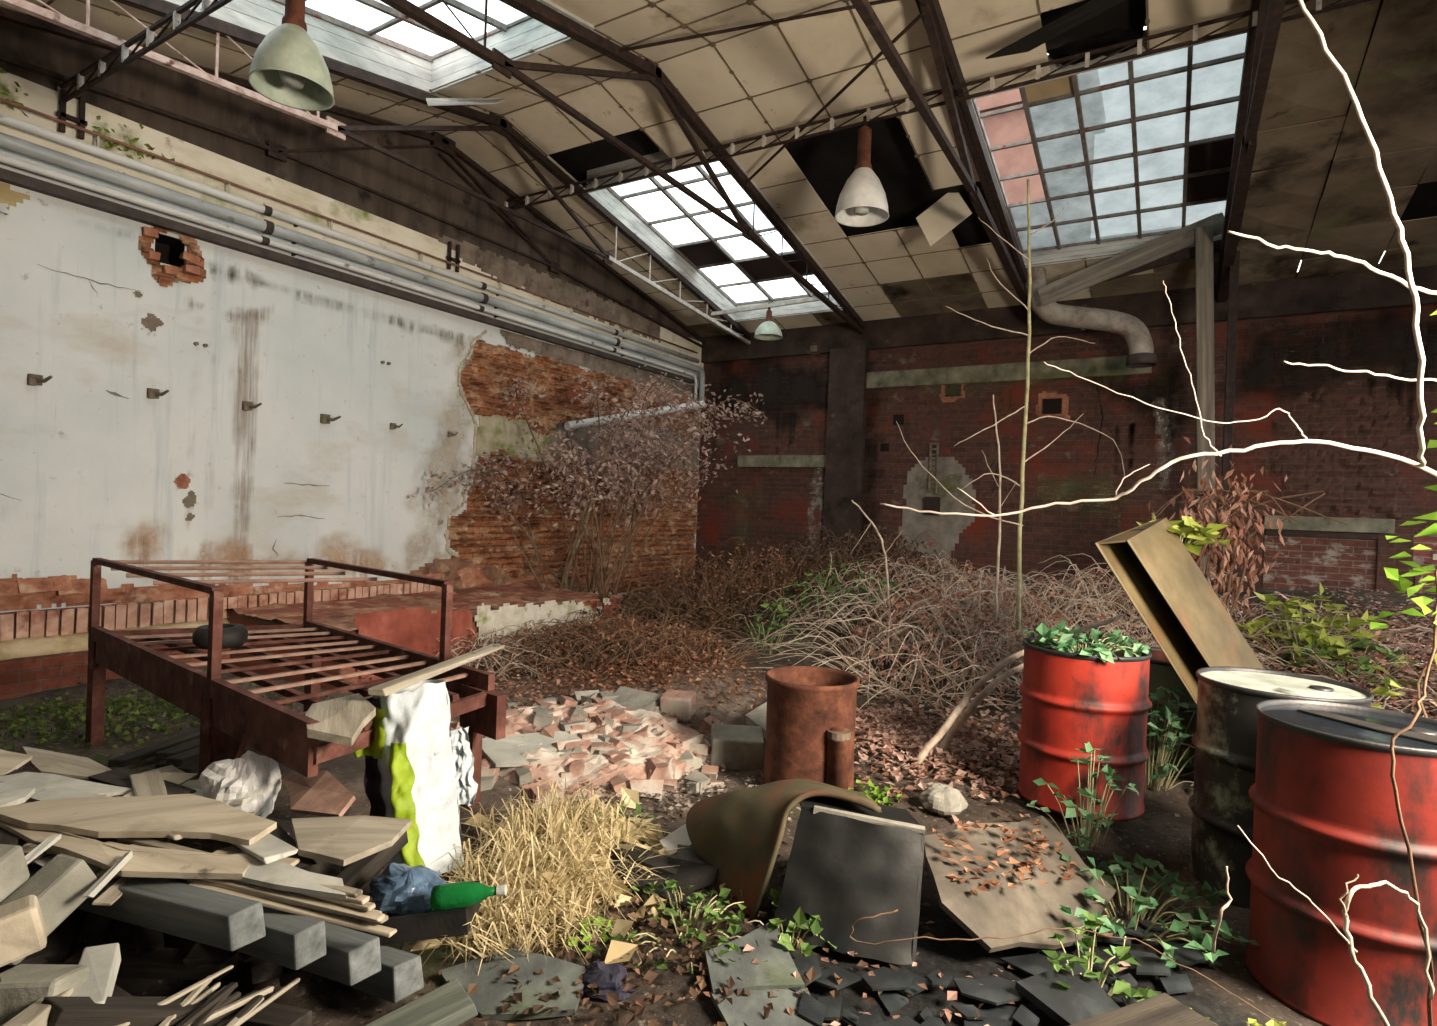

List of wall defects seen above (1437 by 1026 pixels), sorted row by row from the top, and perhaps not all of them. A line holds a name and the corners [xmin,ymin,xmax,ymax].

peeling [0,182,30,216]
spalling [133,226,206,337]
flaking render [0,329,702,659]